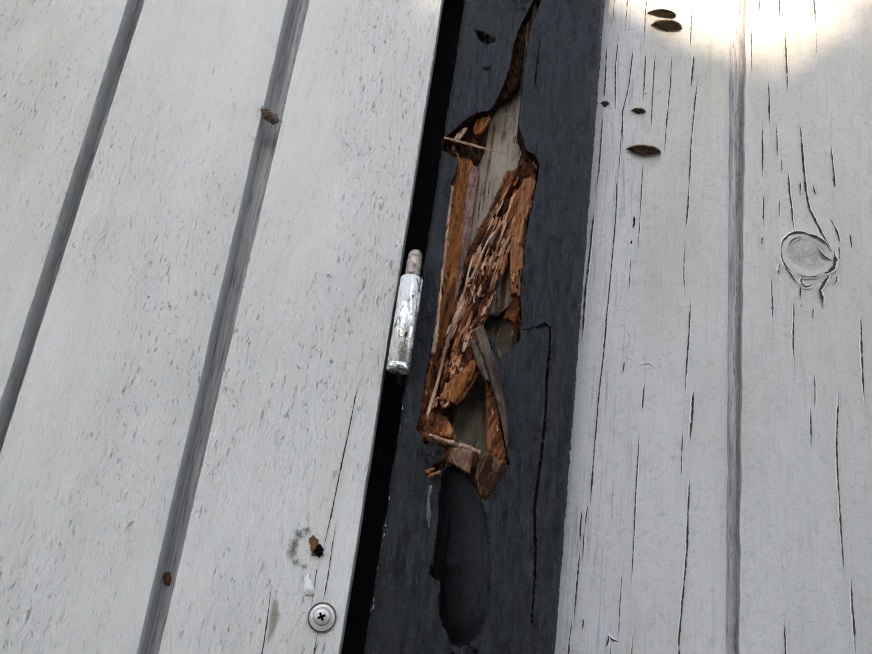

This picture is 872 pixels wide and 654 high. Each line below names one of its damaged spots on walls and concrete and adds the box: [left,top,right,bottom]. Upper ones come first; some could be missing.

spalling [418,0,537,527]
crack [522,322,552,625]
crack [750,0,852,367]
crack [809,375,856,654]
crack [858,316,866,402]